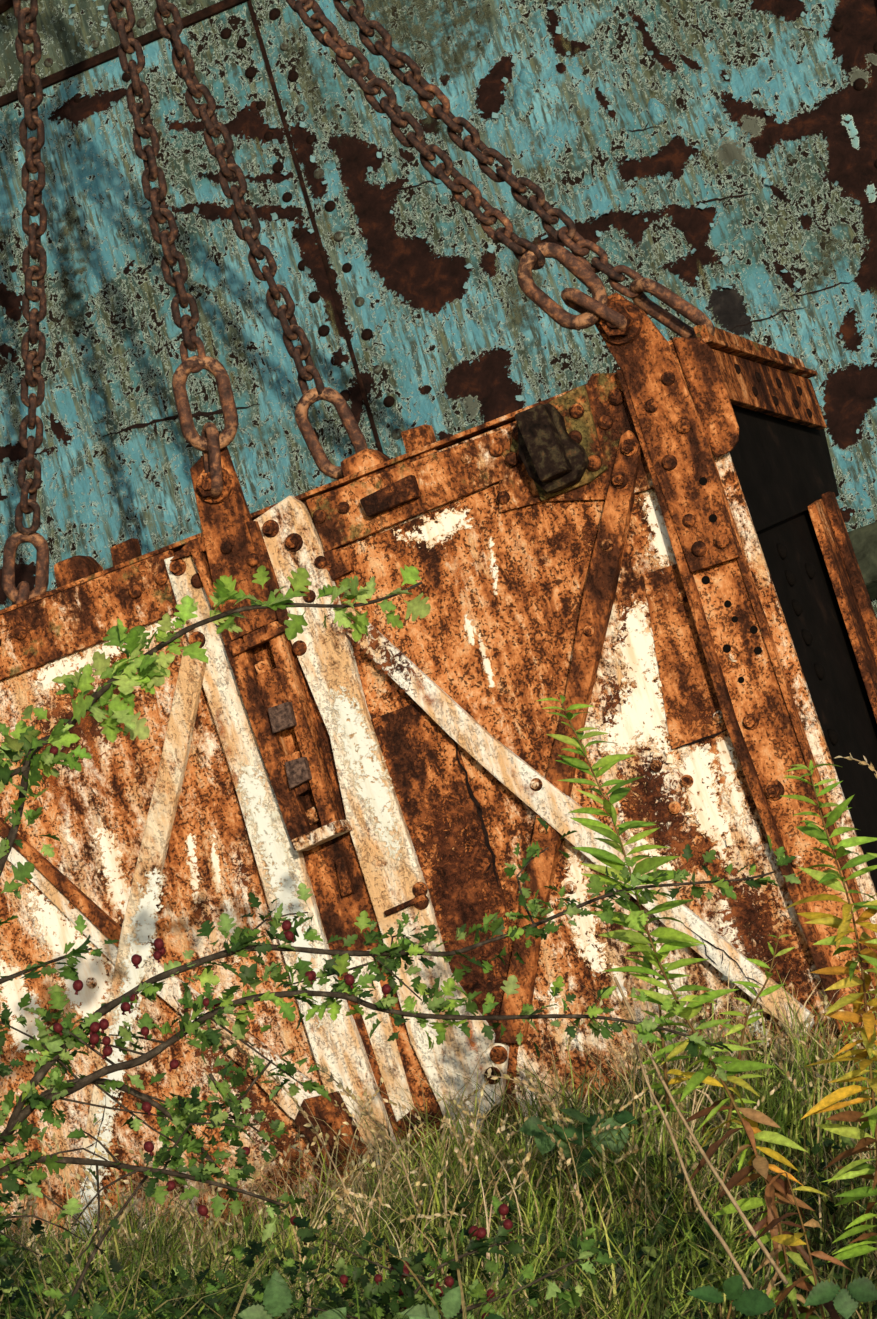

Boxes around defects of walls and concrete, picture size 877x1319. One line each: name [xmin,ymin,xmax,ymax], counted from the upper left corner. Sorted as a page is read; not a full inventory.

peeling [138,99,501,433]
peeling [530,126,755,341]
peeling [717,0,877,451]
peeling [418,345,528,425]
peeling [392,504,474,550]
rust [24,674,157,814]
rust [223,843,256,892]
rust [326,594,434,703]
rust [407,779,515,1051]
peeling [593,599,750,871]
rust [591,669,816,997]
rust [176,1026,324,1191]